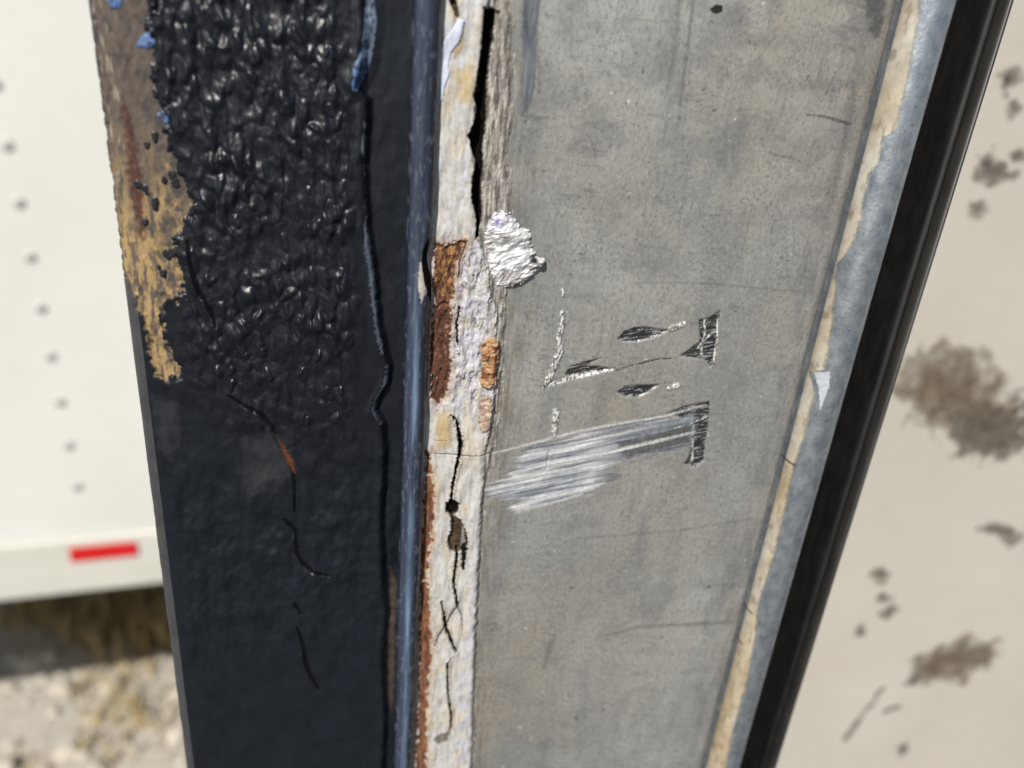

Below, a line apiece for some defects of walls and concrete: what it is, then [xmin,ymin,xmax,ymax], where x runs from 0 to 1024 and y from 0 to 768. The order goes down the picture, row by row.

peeling [90,0,194,383]
crack [449,0,495,278]
crack [229,395,330,577]
rust [415,241,467,768]
crack [453,306,461,345]
crack [434,416,491,497]
rust [477,338,500,433]
peeling [706,0,920,768]
crack [293,602,319,689]
crack [435,545,463,744]